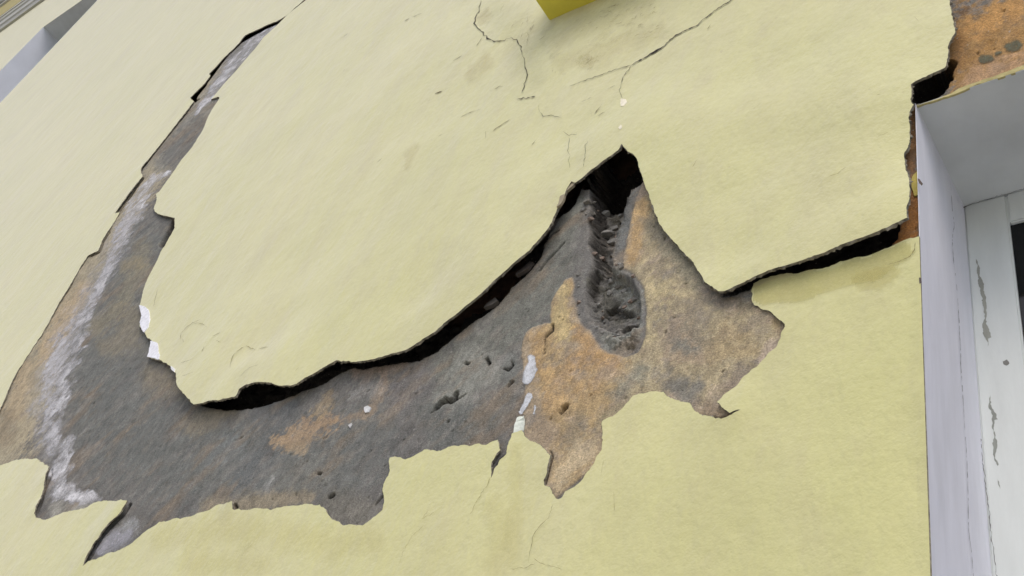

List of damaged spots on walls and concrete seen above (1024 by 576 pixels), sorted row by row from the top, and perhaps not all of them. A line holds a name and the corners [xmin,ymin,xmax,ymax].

leakage [194,26,275,115]
crack [453,3,587,166]
crack [574,0,731,114]
flaking render [902,0,1024,241]
leakage [39,170,171,505]
flaking render [0,25,785,564]
peeling [976,259,991,344]
peeling [988,398,999,466]